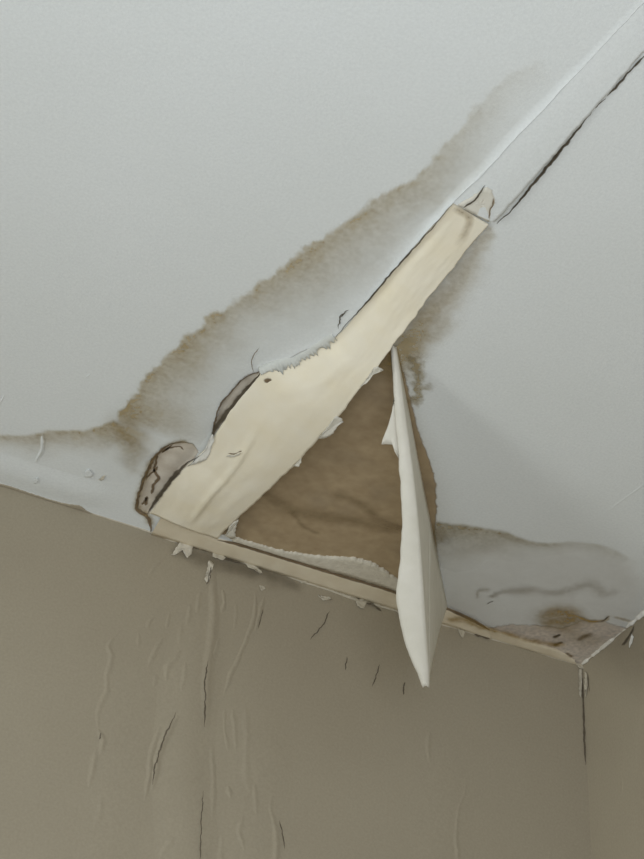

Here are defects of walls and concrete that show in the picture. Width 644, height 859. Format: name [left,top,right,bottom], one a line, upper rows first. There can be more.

crack [336,56,644,337]
leakage [93,395,142,436]
flaking render [213,350,259,438]
leakage [387,320,429,402]
flaking render [135,442,198,532]
leakage [491,621,626,664]